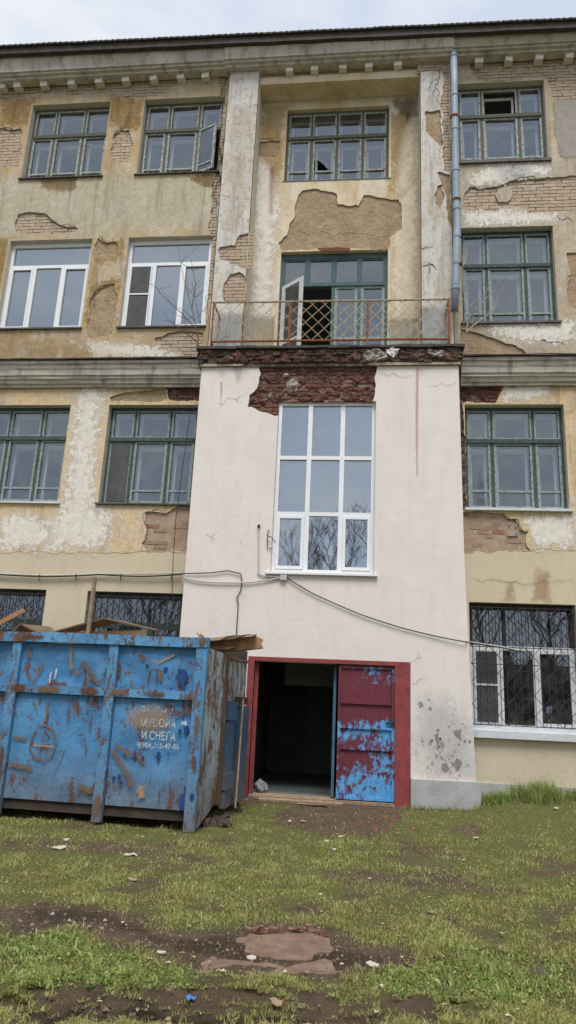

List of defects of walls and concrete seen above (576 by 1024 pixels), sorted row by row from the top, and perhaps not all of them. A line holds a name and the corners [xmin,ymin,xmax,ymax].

flaking render [0,128,22,168]
flaking render [14,212,78,235]
flaking render [82,58,576,416]
peeling [0,388,124,562]
flaking render [142,506,190,553]
flaking render [459,382,576,554]